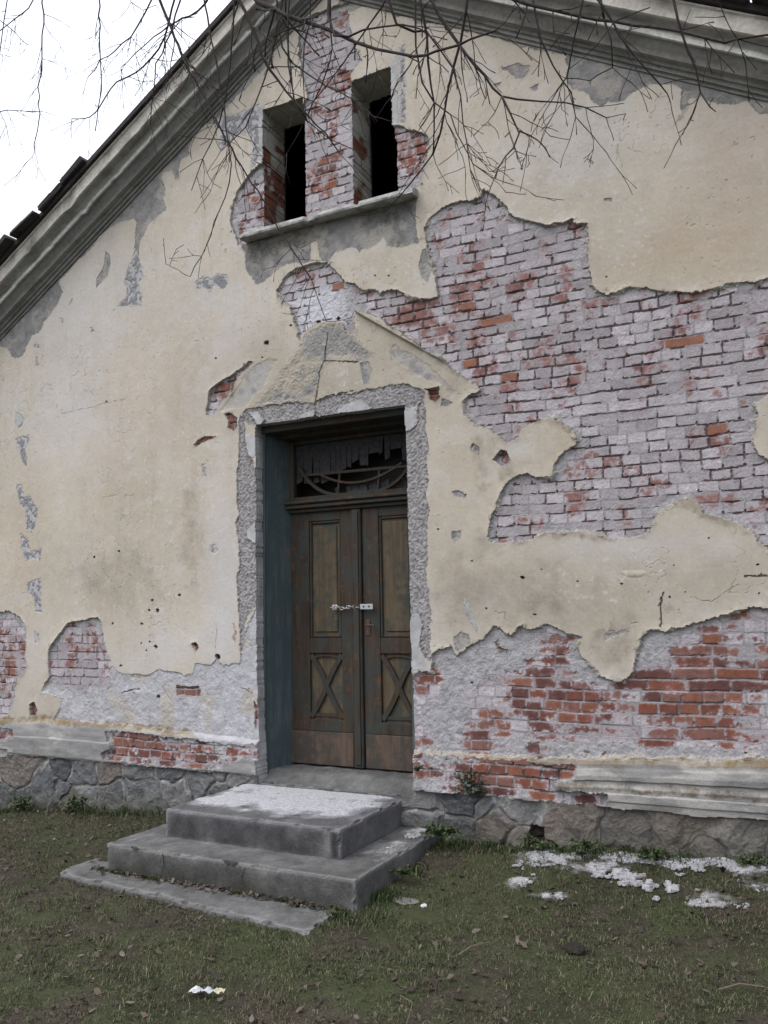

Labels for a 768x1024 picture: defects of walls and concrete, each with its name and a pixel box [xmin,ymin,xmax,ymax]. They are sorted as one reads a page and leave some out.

peeling [0,135,195,367]
crack [313,334,359,416]
flaking render [205,0,768,550]
flaking render [0,606,259,772]
flaking render [412,597,768,807]